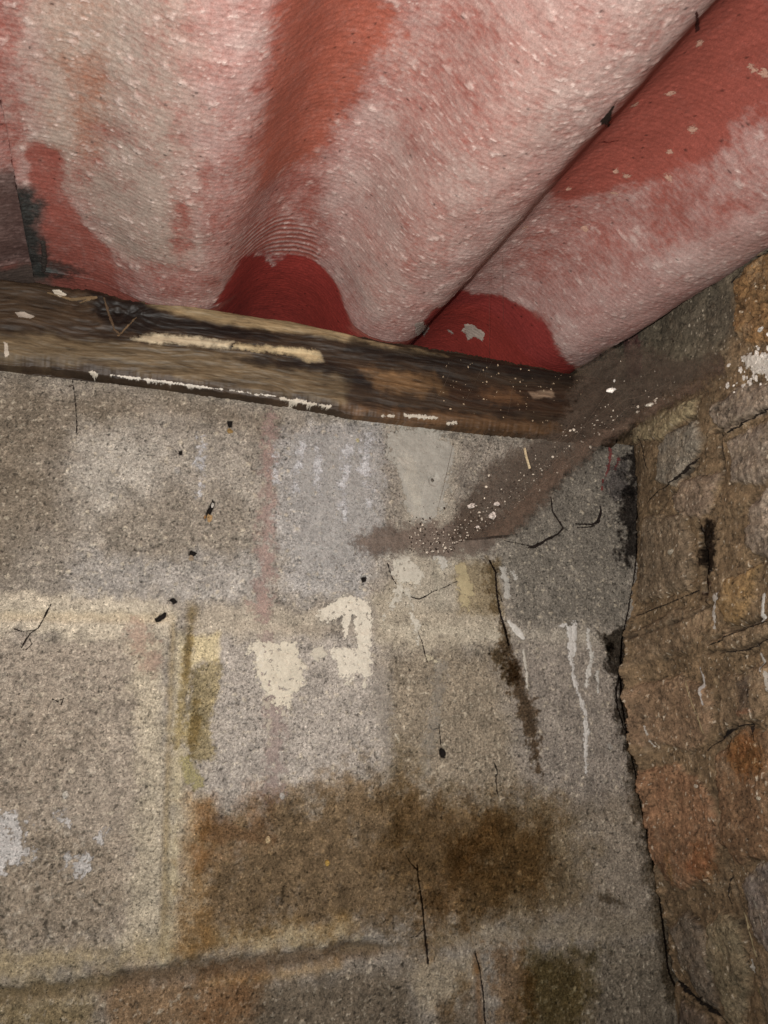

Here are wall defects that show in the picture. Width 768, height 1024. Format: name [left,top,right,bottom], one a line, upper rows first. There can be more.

water stain [136,334,322,362]
water stain [448,324,485,341]
water stain [614,445,638,567]
water stain [499,566,518,599]
crack [489,497,602,646]
crack [624,530,700,630]
peeling [245,552,440,748]
water stain [493,619,542,773]
water stain [558,620,635,774]
crack [631,755,653,866]
crack [406,855,429,964]
crack [659,897,726,1021]